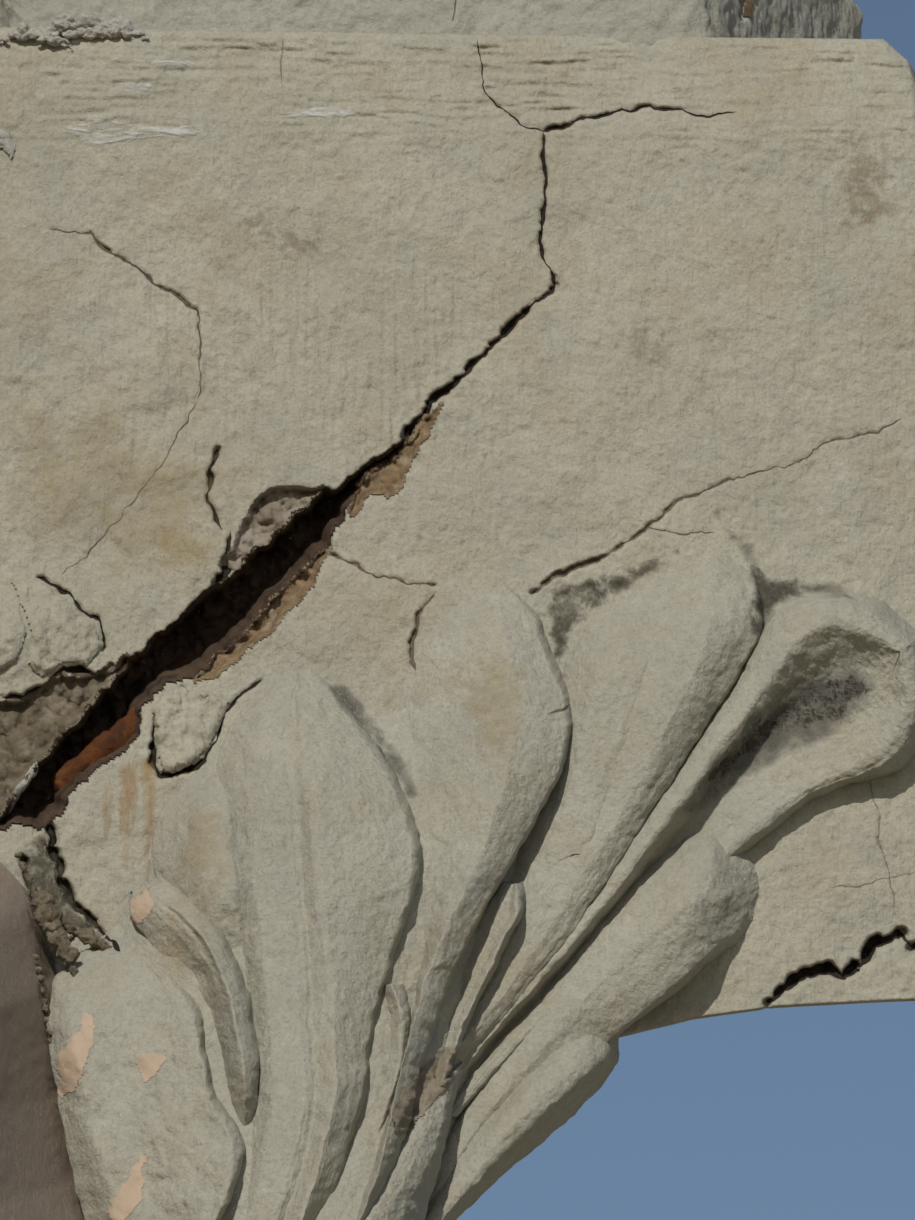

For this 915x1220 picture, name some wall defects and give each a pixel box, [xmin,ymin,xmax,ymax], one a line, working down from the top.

crack [404,40,736,435]
crack [2,228,202,701]
crack [206,448,232,583]
crack [533,418,901,593]
spalling [0,401,444,830]
crack [332,554,435,670]
leakage [551,560,655,655]
leakage [751,568,826,632]
corrosion [52,705,137,792]
crack [148,680,261,778]
leakage [704,672,871,798]
crack [766,782,915,1003]